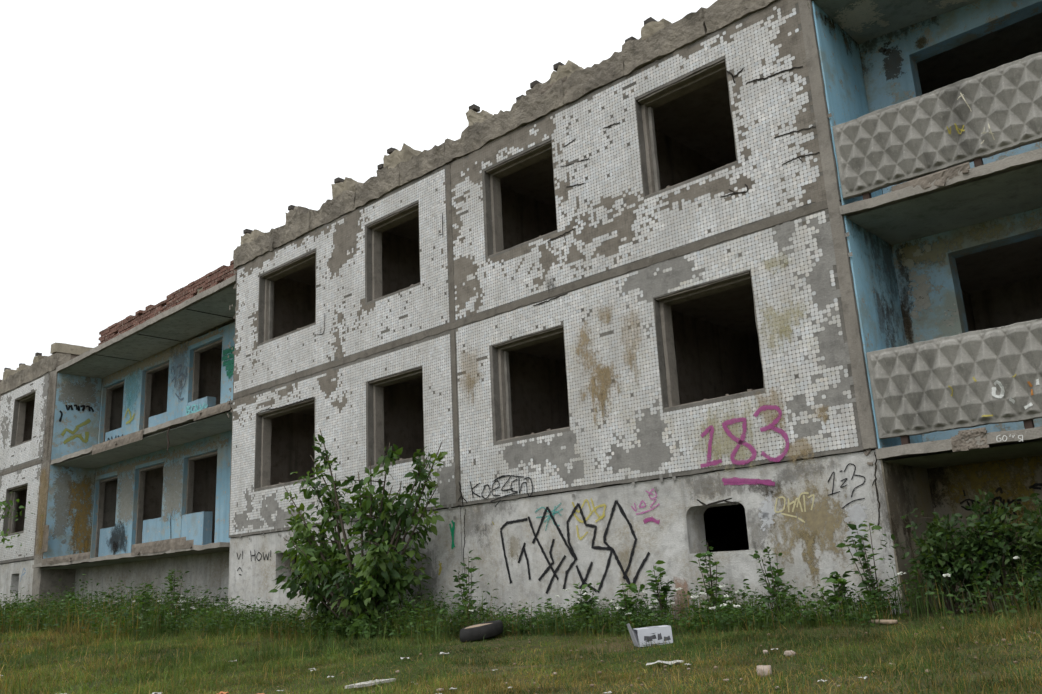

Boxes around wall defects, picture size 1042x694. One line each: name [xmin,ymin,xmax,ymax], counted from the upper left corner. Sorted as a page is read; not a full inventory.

crack [727,66,803,84]
peeling [878,40,906,81]
crack [774,126,820,165]
peeling [441,72,758,332]
peeling [608,0,856,453]
crack [720,184,748,198]
peeling [194,204,375,427]
peeling [497,399,683,498]
peeling [232,485,307,541]